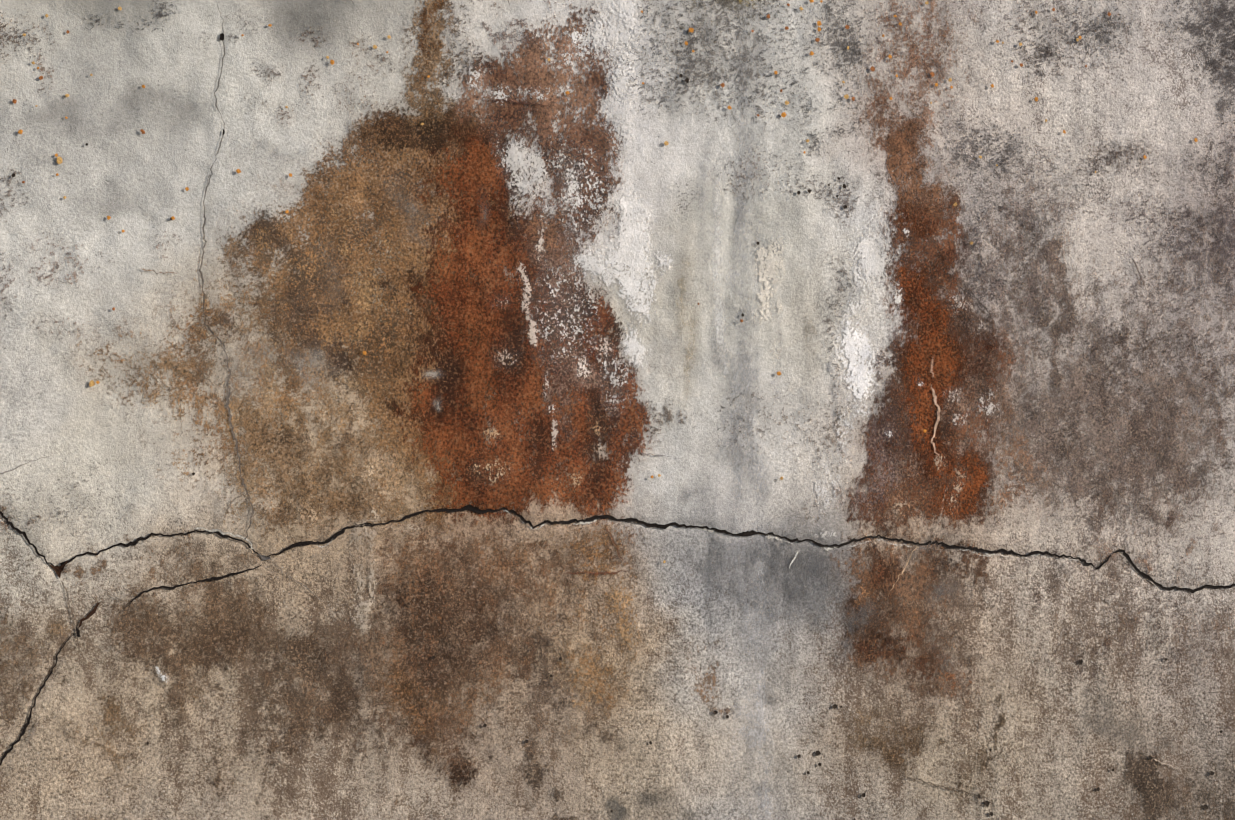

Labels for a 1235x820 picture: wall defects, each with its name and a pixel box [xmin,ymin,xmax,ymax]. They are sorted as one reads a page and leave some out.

crack [214,15,225,125]
rust [81,0,653,793]
crack [0,129,1235,765]
rust [833,0,1061,734]
leakage [934,0,1235,688]
leakage [330,508,379,634]
leakage [0,607,80,726]
leakage [61,531,370,803]
leakage [664,619,730,718]
leakage [518,738,578,820]
leakage [607,798,627,820]